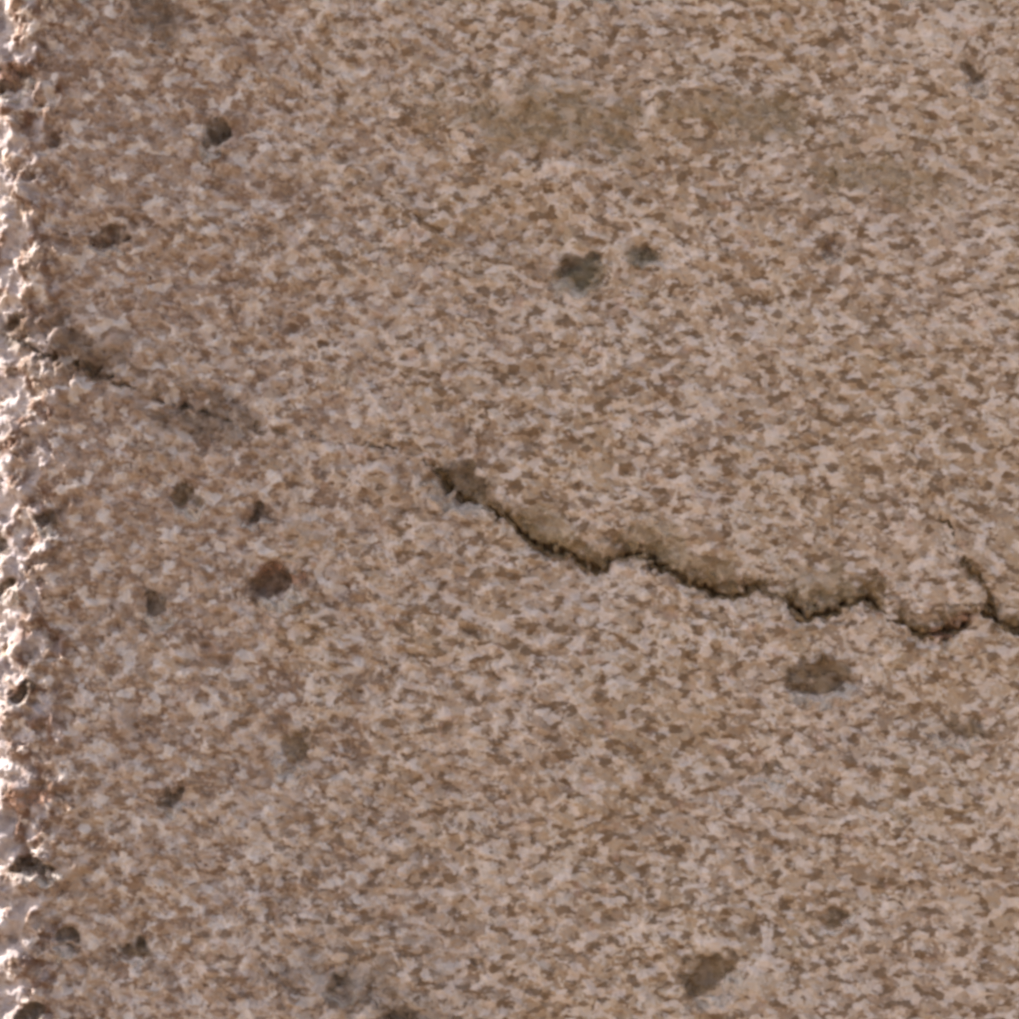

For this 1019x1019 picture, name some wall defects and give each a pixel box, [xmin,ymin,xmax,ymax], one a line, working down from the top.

crack [435,469,1019,641]